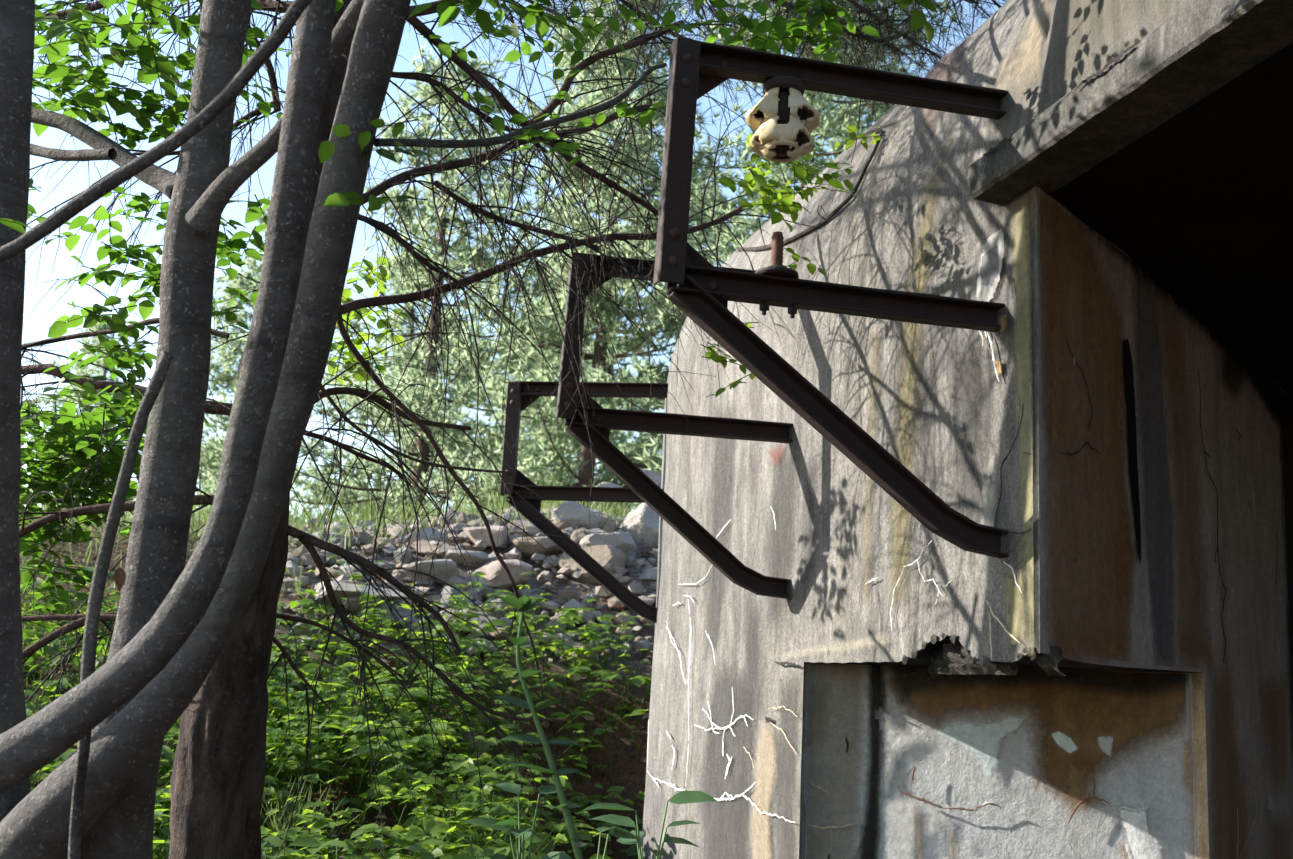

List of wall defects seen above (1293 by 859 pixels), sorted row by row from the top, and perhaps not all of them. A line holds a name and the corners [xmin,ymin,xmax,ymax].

crack [865,540,951,631]
spalling [902,633,1065,676]
crack [647,519,858,859]
peeling [939,717,1023,779]
peeling [1052,731,1077,753]
peeling [1098,737,1113,754]